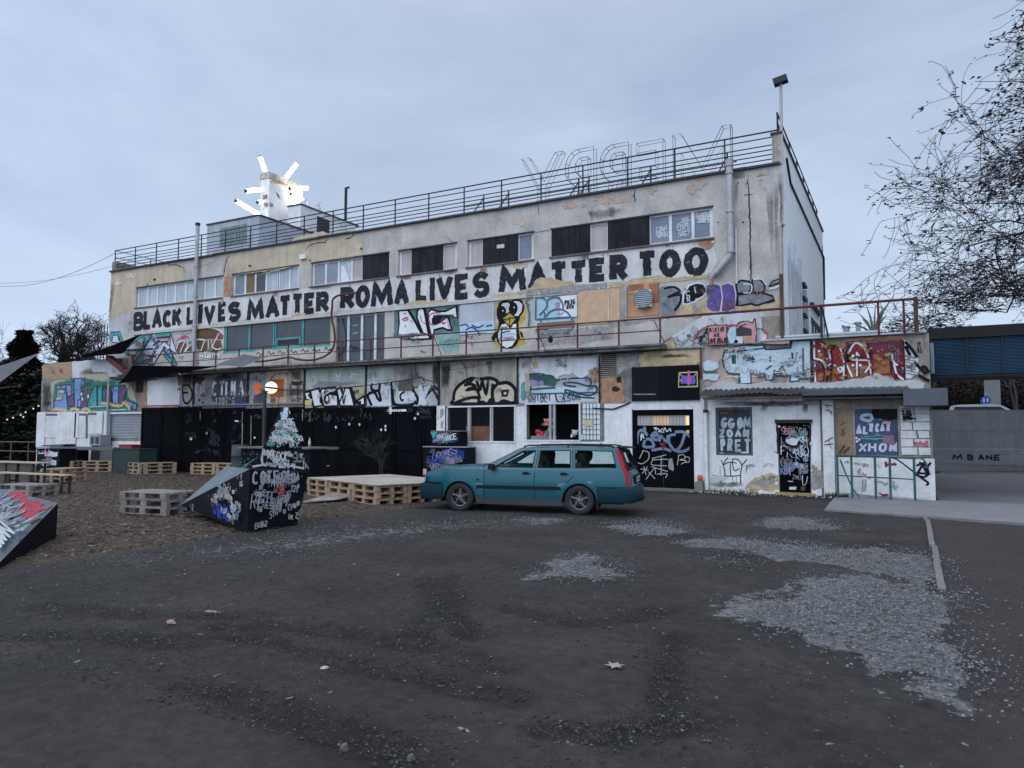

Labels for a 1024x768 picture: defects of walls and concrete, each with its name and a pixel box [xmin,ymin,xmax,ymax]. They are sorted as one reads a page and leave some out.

peeling [686,179,708,195]